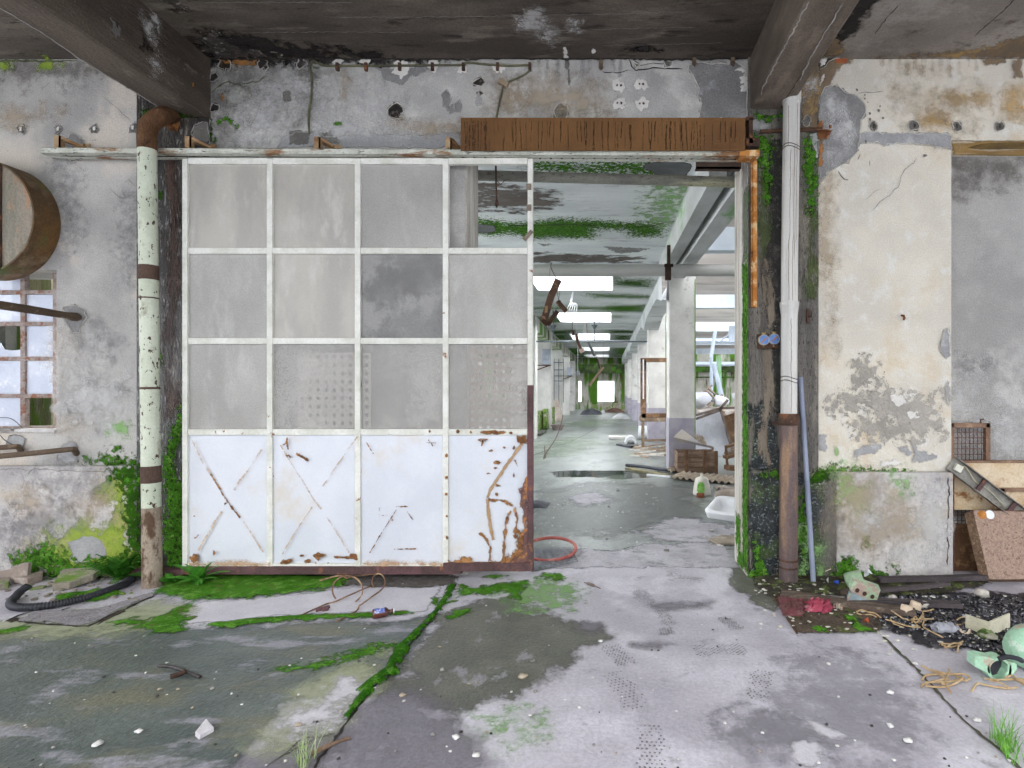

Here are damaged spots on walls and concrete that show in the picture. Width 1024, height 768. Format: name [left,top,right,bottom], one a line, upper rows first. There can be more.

flaking render [801,58,963,185]
leakage [512,38,853,611]
flaking render [939,328,951,359]
corrosion [189,385,534,567]
leakage [798,473,951,576]
flaking render [822,353,953,496]